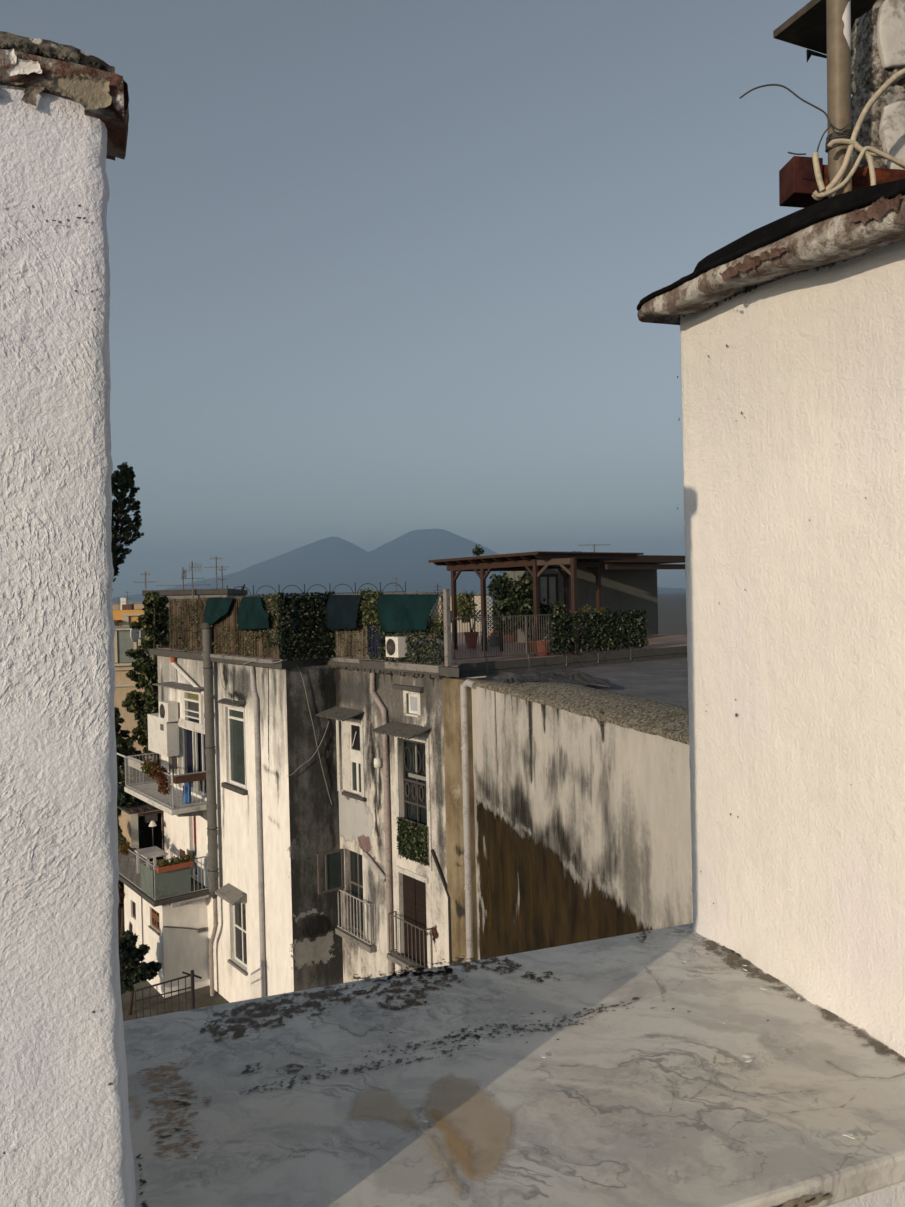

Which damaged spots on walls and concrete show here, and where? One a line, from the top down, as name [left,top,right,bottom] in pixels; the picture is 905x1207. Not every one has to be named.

spalling [0,48,112,110]
peeling [851,194,902,224]
peeling [720,244,792,283]
leakage [217,662,276,702]
leakage [318,668,392,846]
leakage [478,694,617,894]
spalling [774,1193,832,1207]